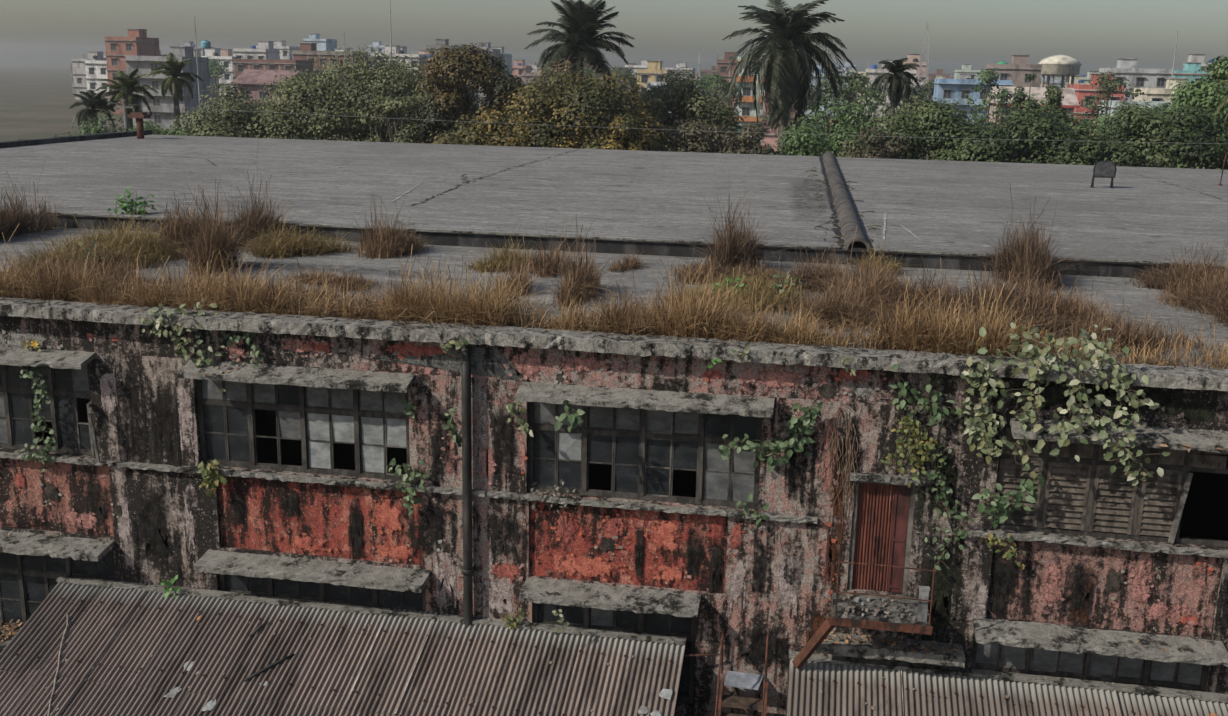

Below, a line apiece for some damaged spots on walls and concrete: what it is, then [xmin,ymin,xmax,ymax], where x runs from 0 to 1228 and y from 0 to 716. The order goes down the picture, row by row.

crack [411,149,579,206]
peeling [503,352,614,384]
peeling [40,479,97,530]
water stain [83,367,199,587]
peeling [277,533,348,555]
peeling [370,494,415,562]
peeling [488,511,629,583]
peeling [644,520,691,584]
water stain [682,524,798,617]
peeling [1100,558,1203,626]
water stain [1215,574,1228,641]
water stain [724,627,789,672]